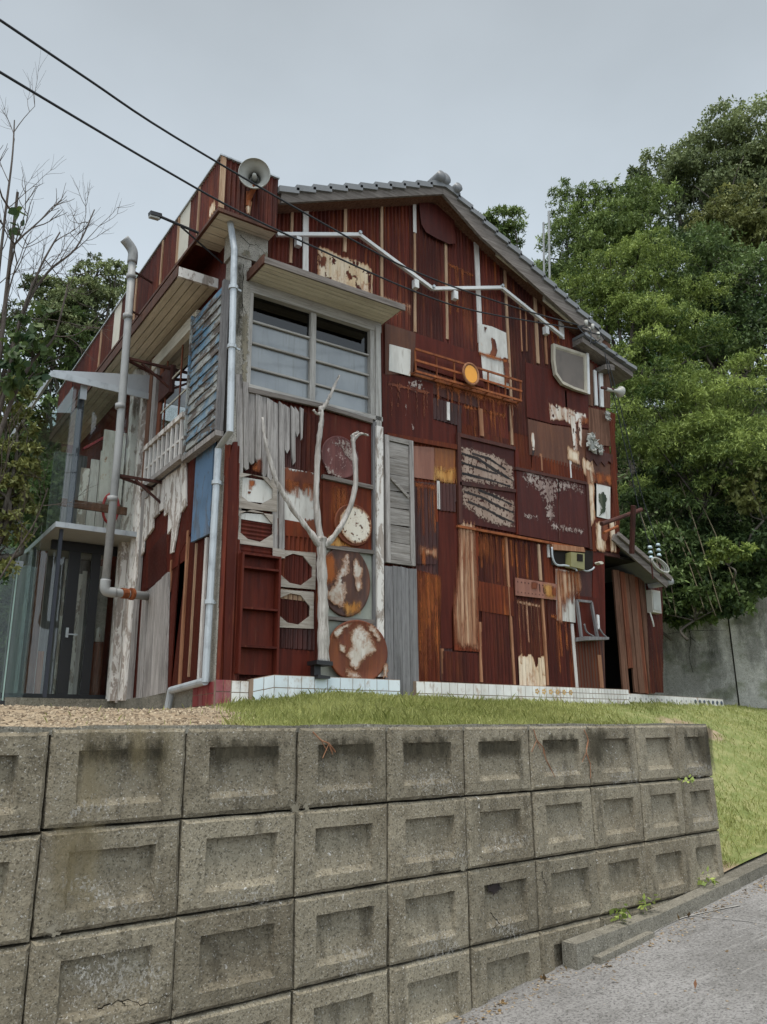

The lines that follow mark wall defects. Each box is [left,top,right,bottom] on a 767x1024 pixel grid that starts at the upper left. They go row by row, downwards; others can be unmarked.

peeling [317,246,373,294]
corrosion [285,467,320,506]
peeling [453,403,611,650]
peeling [326,506,381,678]
corrosion [478,532,582,673]
peeling [518,653,546,686]
crack [97,994,170,1010]